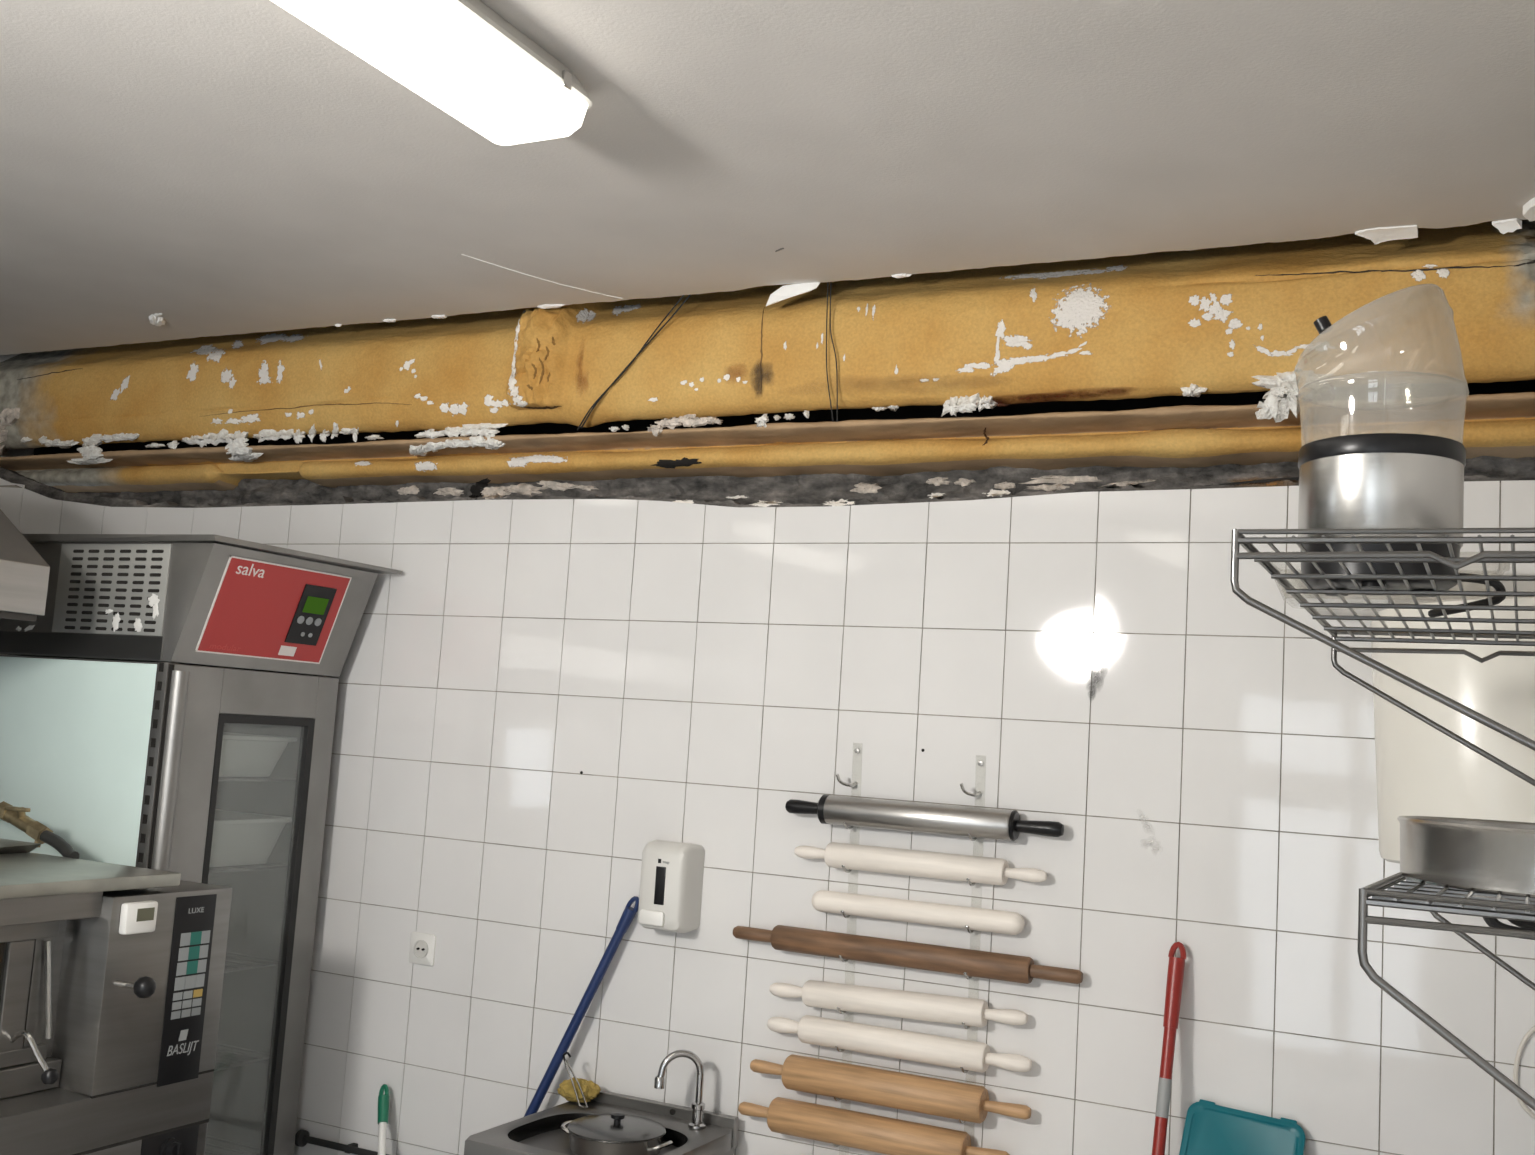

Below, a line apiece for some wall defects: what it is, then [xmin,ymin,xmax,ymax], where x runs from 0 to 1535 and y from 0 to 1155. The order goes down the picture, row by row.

peeling [1355,225,1418,245]
crack [1255,260,1535,276]
peeling [1411,264,1450,281]
peeling [766,282,820,306]
peeling [957,265,1126,376]
peeling [1188,293,1335,357]
peeling [186,334,303,389]
spalling [399,304,641,416]
peeling [210,409,261,426]
spalling [397,454,597,500]
spalling [824,483,882,506]
spalling [926,475,1155,499]